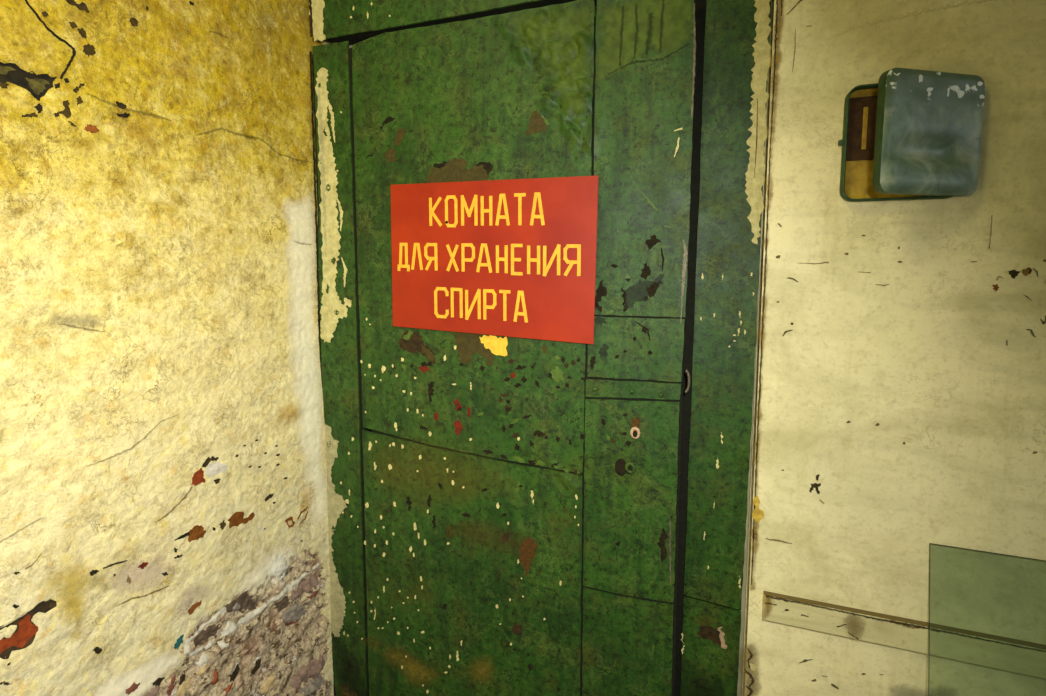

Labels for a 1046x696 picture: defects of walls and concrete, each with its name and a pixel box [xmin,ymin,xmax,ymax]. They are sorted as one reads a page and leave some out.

crack [25,0,76,79]
flaking render [0,62,100,133]
peeling [158,439,258,521]
peeling [174,512,255,559]
flaking render [0,599,57,666]
flaking render [89,540,344,696]